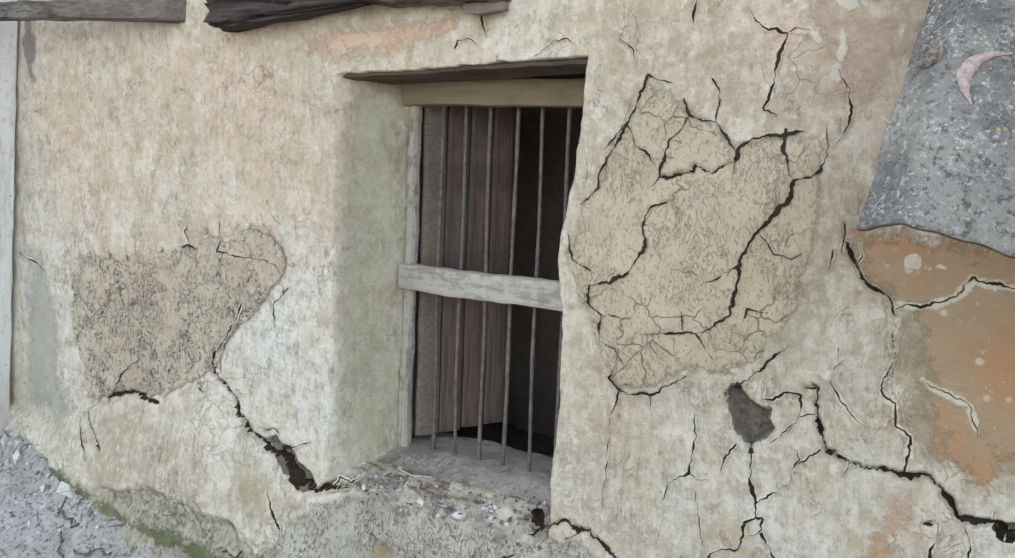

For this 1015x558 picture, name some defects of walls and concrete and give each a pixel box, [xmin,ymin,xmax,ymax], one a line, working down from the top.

crack [453,15,488,49]
crack [690,0,699,29]
crack [181,222,276,266]
flaking render [69,223,294,404]
crack [502,6,1015,558]
peeling [852,225,1015,487]
crack [79,360,159,461]
crack [198,297,366,544]
flaking render [723,383,775,448]
flaking render [266,435,316,493]
flaking render [83,487,594,558]